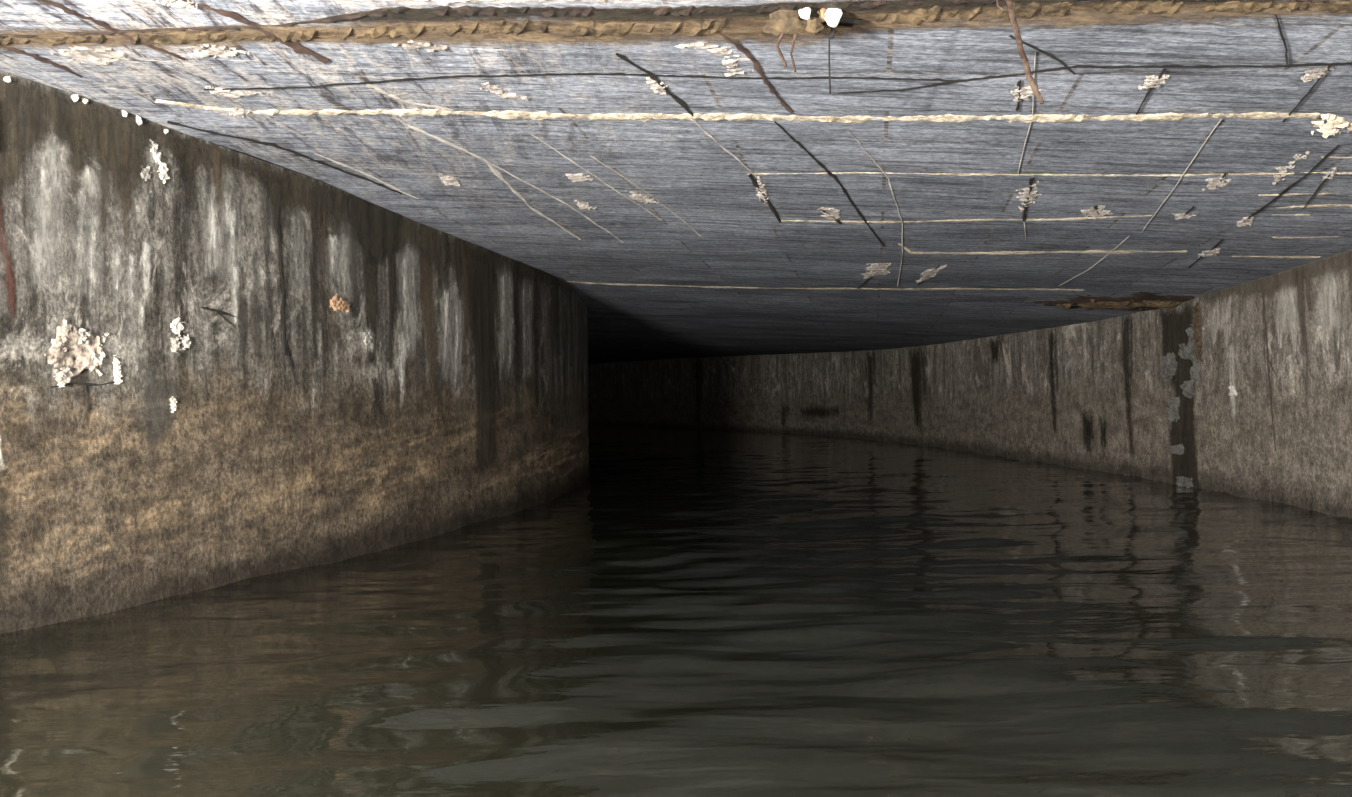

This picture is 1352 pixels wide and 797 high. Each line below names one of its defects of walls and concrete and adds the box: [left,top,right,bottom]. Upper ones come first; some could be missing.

crack [0,45,83,78]
crack [39,0,185,61]
damp [0,0,1352,48]
crack [167,0,1352,288]
damp [0,73,571,471]
crack [277,207,296,385]
damp [910,350,926,430]
damp [1048,331,1058,430]
damp [1082,413,1106,455]
damp [1123,318,1133,452]
damp [1200,251,1352,417]